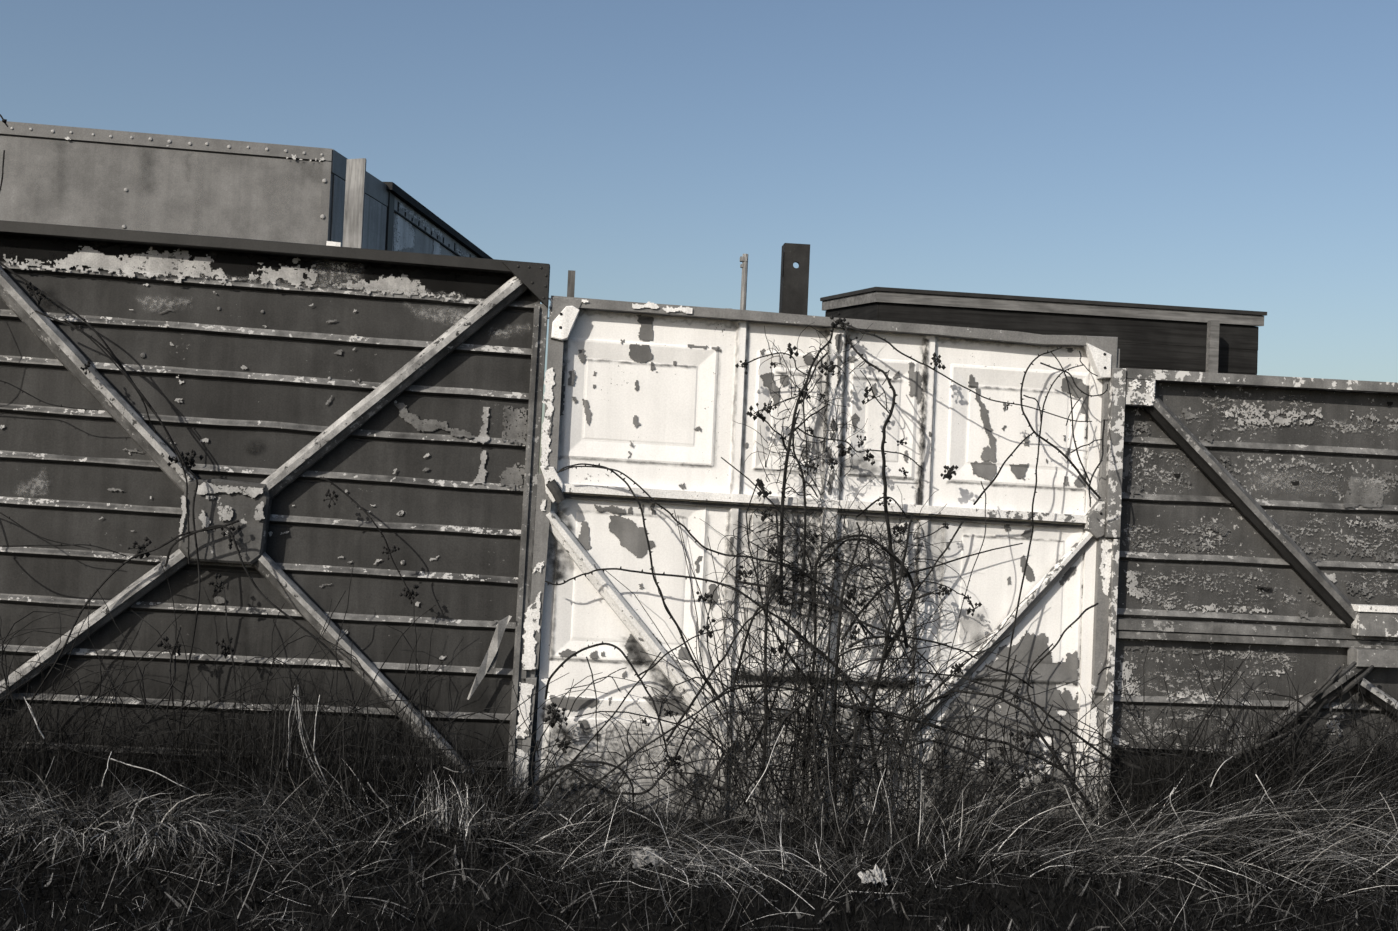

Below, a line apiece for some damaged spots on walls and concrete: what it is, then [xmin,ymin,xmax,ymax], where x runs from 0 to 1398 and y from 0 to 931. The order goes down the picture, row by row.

peeling [3,246,461,306]
peeling [621,302,693,373]
peeling [394,349,597,491]
peeling [760,372,790,405]
peeling [968,374,1029,482]
peeling [1061,376,1089,438]
peeling [1221,404,1323,428]
peeling [179,482,289,539]
peeling [576,504,656,558]
peeling [1099,539,1272,614]
peeling [1115,638,1292,713]
peeling [922,630,1129,832]